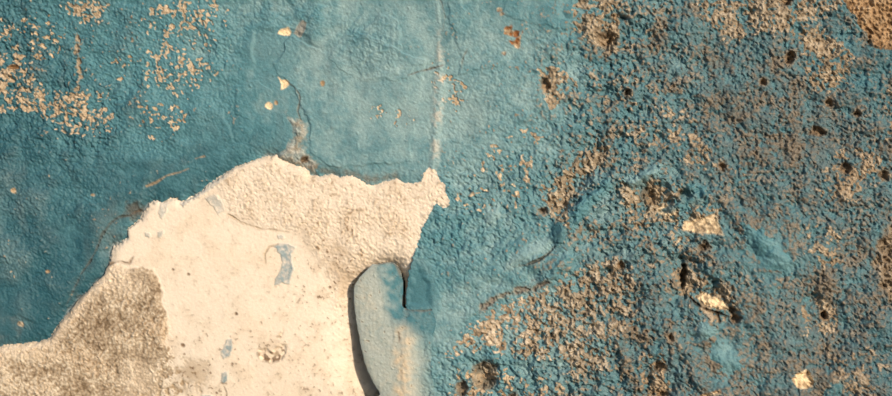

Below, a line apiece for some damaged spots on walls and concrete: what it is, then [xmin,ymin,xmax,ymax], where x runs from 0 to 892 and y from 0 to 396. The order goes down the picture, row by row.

peeling [0,15,115,143]
peeling [60,0,111,25]
peeling [111,0,230,132]
spalling [696,0,892,94]
peeling [539,143,611,230]
peeling [618,175,723,248]
peeling [816,89,892,203]
crack [67,215,135,304]
flaking render [0,155,496,396]
peeling [445,256,637,396]
spalling [792,370,814,389]
peeling [826,347,891,396]